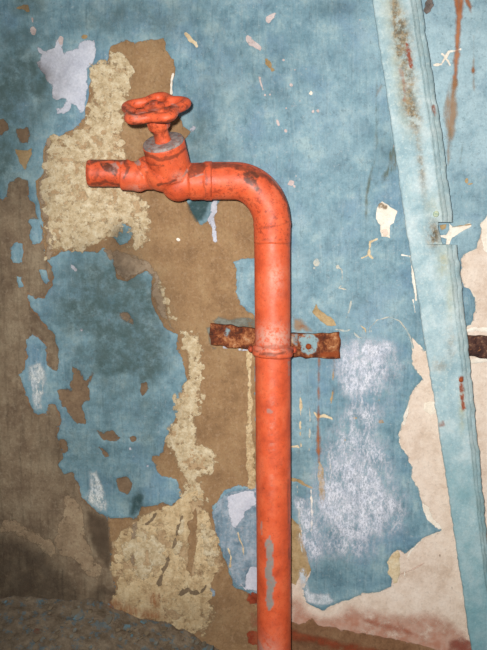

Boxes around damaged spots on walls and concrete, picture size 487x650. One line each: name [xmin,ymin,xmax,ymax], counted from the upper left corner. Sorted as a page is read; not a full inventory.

peeling [246,35,262,51]
rust [447,0,471,136]
peeling [0,35,257,650]
peeling [440,223,472,244]
peeling [460,217,487,336]
damp [295,341,403,559]
peeling [291,338,470,650]
peeling [469,356,487,536]
damp [300,569,333,605]